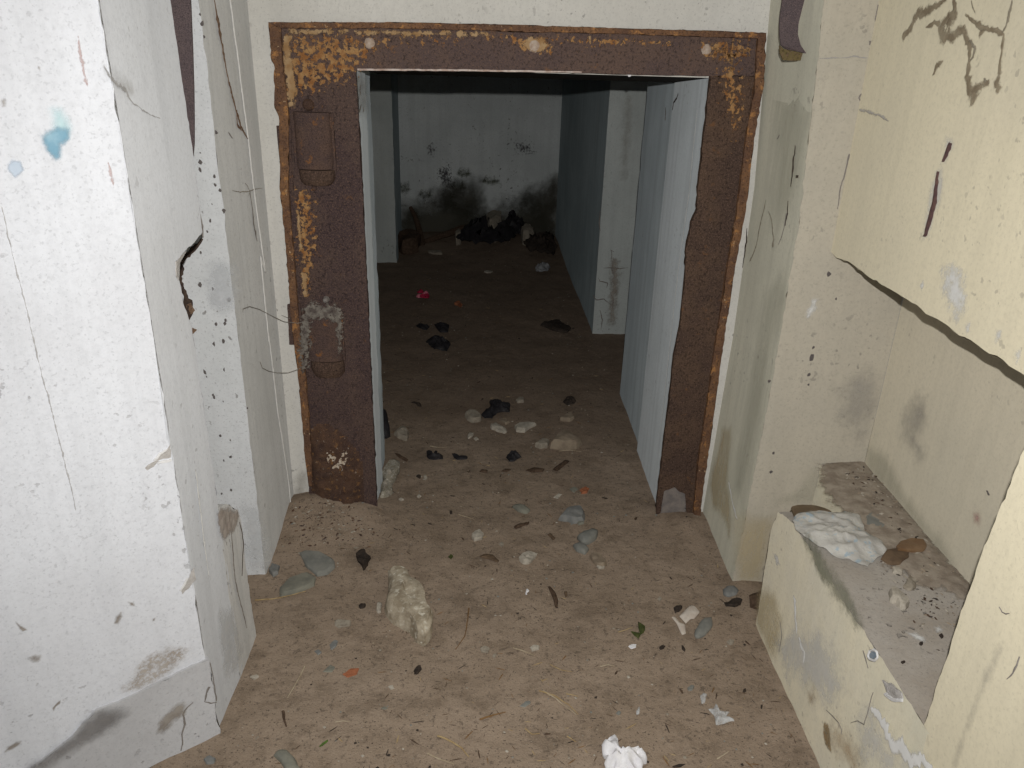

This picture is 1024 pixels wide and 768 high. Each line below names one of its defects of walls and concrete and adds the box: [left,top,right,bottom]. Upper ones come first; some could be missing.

corrosion [282,21,671,107]
corrosion [701,38,754,154]
damp [401,164,557,236]
crack [179,214,204,334]
corrosion [294,187,321,297]
corrosion [326,450,348,470]
spalling [218,507,239,538]
corrosion [661,487,686,513]
damp [38,713,118,768]
damp [159,706,183,730]